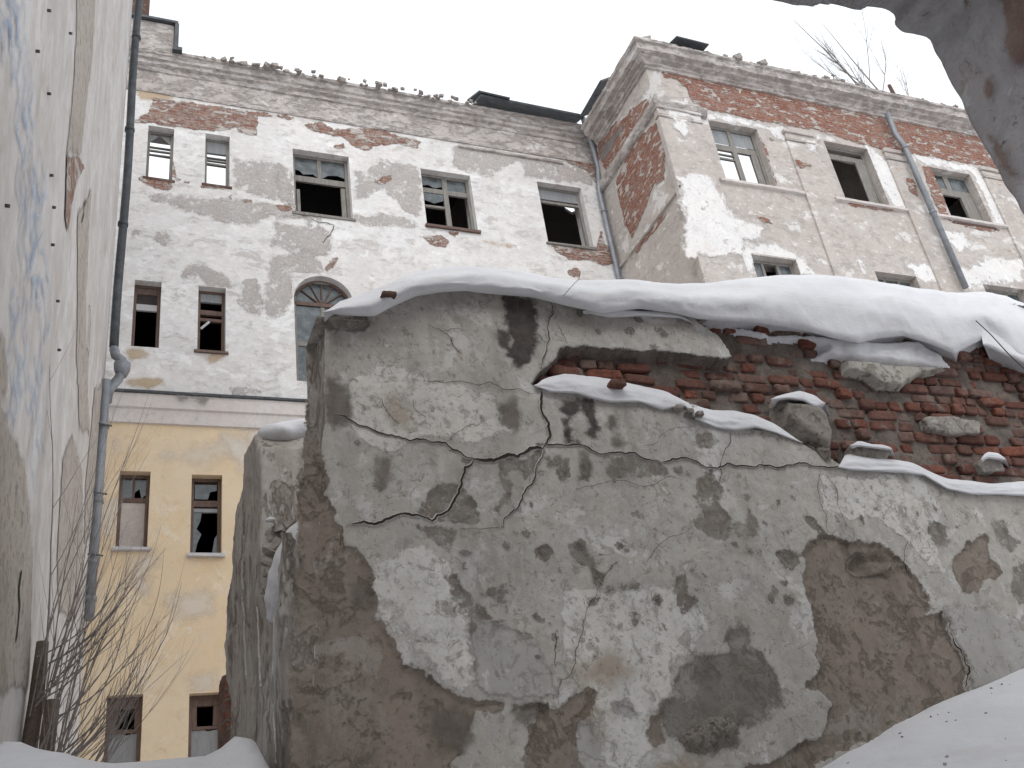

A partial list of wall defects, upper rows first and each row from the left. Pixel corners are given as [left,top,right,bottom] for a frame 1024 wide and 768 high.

spalling [135,98,294,135]
spalling [305,121,420,150]
spalling [453,71,1004,277]
flaking render [57,0,118,623]
peeling [224,431,258,465]
flaking render [287,400,785,768]
crack [333,301,847,530]
spalling [531,319,1024,768]